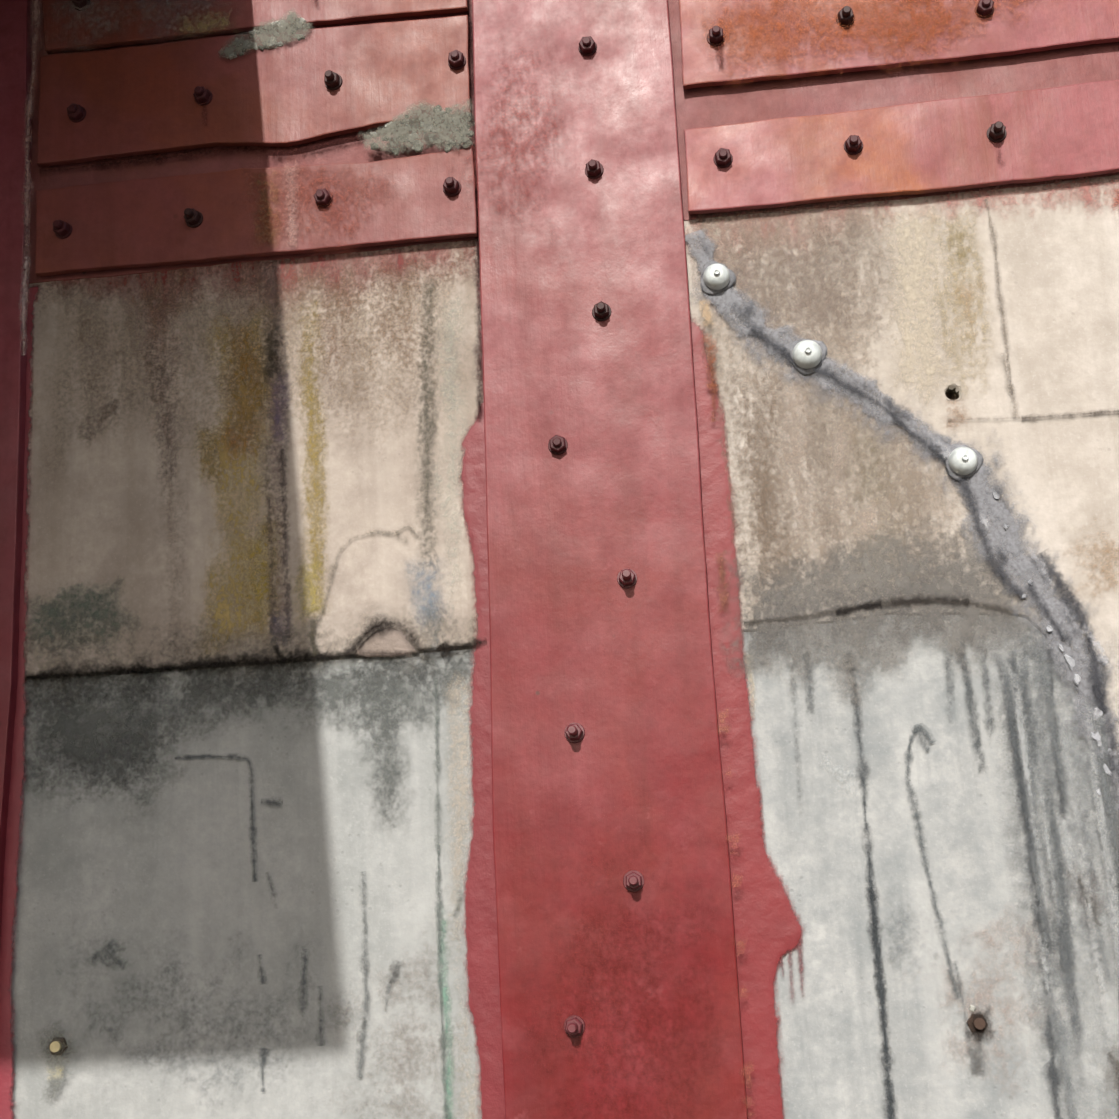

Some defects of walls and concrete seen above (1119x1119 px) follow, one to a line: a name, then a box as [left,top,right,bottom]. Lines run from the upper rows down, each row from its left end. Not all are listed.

damp [266,309,290,642]
damp [420,309,455,553]
crack [685,203,1119,847]
damp [24,655,472,875]
crack [846,653,895,1119]
damp [744,436,1119,1119]
crack [907,724,961,997]
crack [1011,661,1062,1119]
crack [1078,879,1101,926]